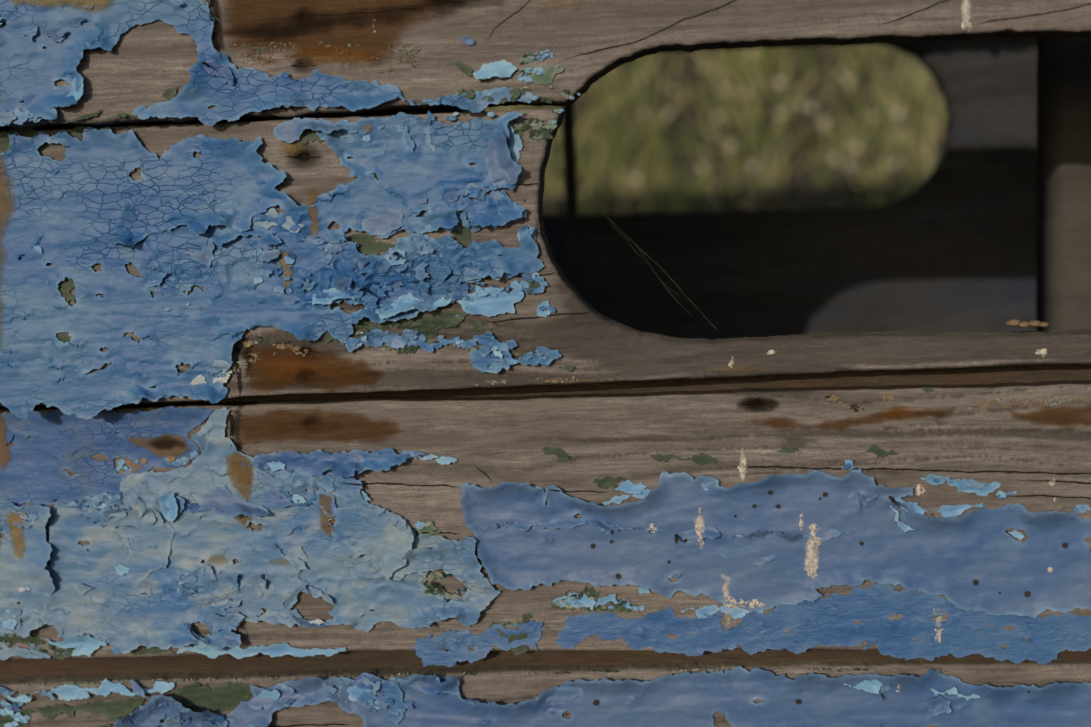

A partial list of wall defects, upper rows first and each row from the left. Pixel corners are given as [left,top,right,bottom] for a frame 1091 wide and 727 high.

rust [210,0,221,47]
peeling [0,0,564,126]
peeling [0,109,1091,667]
peeling [0,666,1091,727]